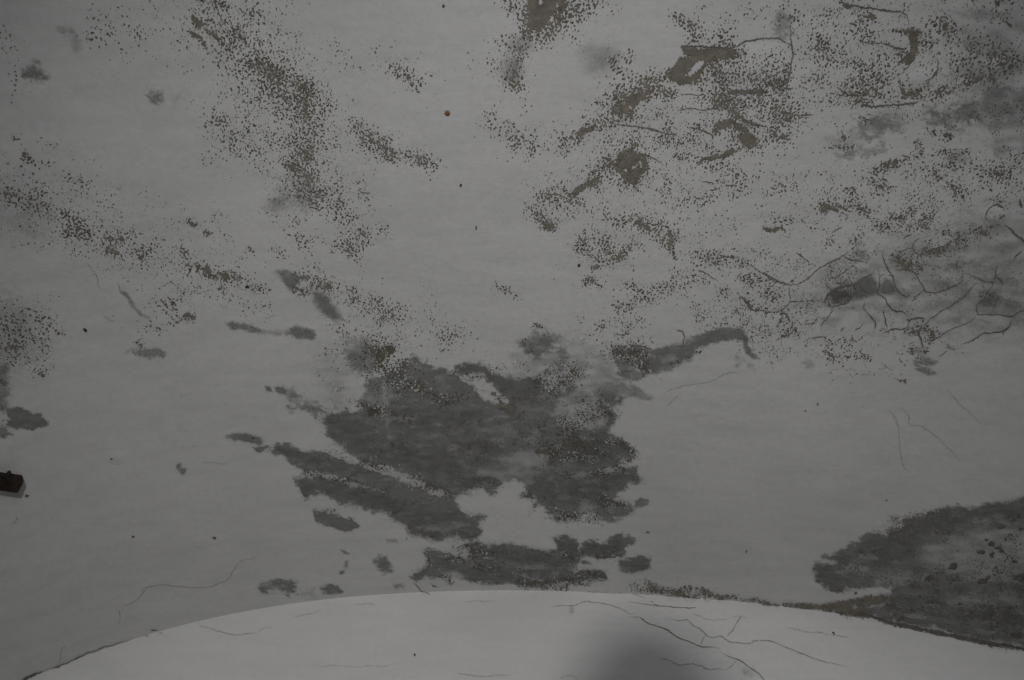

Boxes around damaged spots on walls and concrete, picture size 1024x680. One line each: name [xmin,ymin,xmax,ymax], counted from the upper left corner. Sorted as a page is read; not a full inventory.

crack [837,0,908,18]
crack [682,28,794,86]
crack [836,41,939,108]
crack [699,199,1024,356]
leakage [831,277,894,303]
leakage [0,395,48,438]
leakage [229,323,757,594]
leakage [812,497,1024,652]
crack [571,594,806,680]